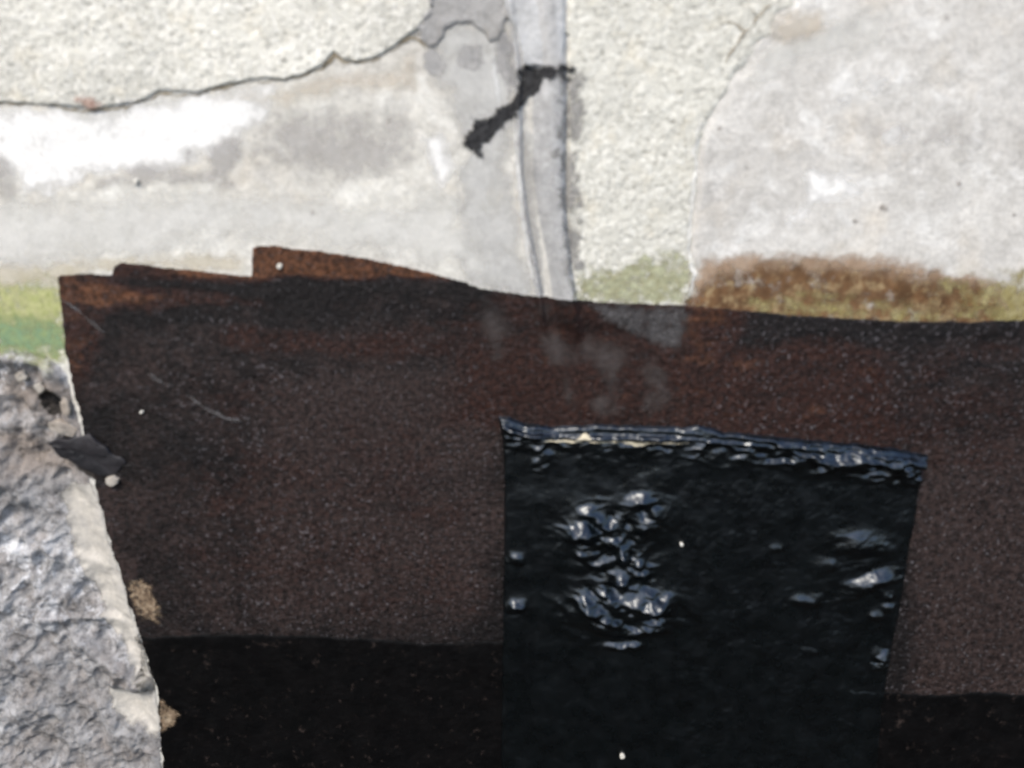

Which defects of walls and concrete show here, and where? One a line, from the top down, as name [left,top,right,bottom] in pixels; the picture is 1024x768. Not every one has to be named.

crack [0,33,427,116]